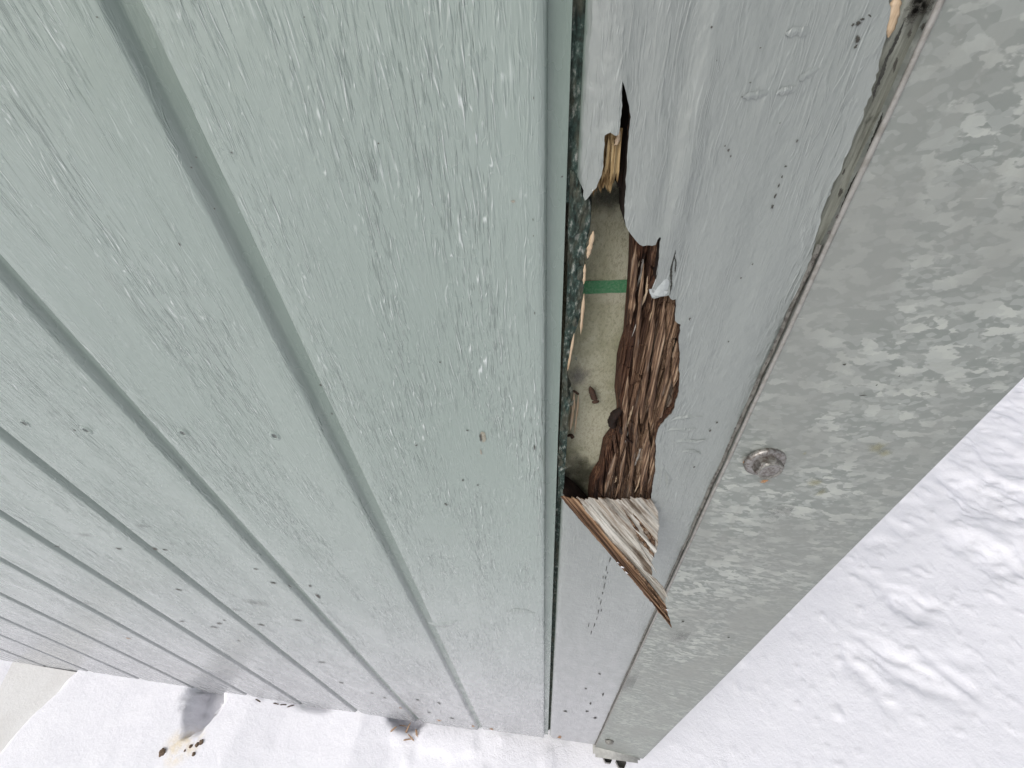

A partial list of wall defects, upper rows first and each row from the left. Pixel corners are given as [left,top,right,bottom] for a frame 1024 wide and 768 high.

peeling [557,170,595,498]
peeling [649,255,669,297]